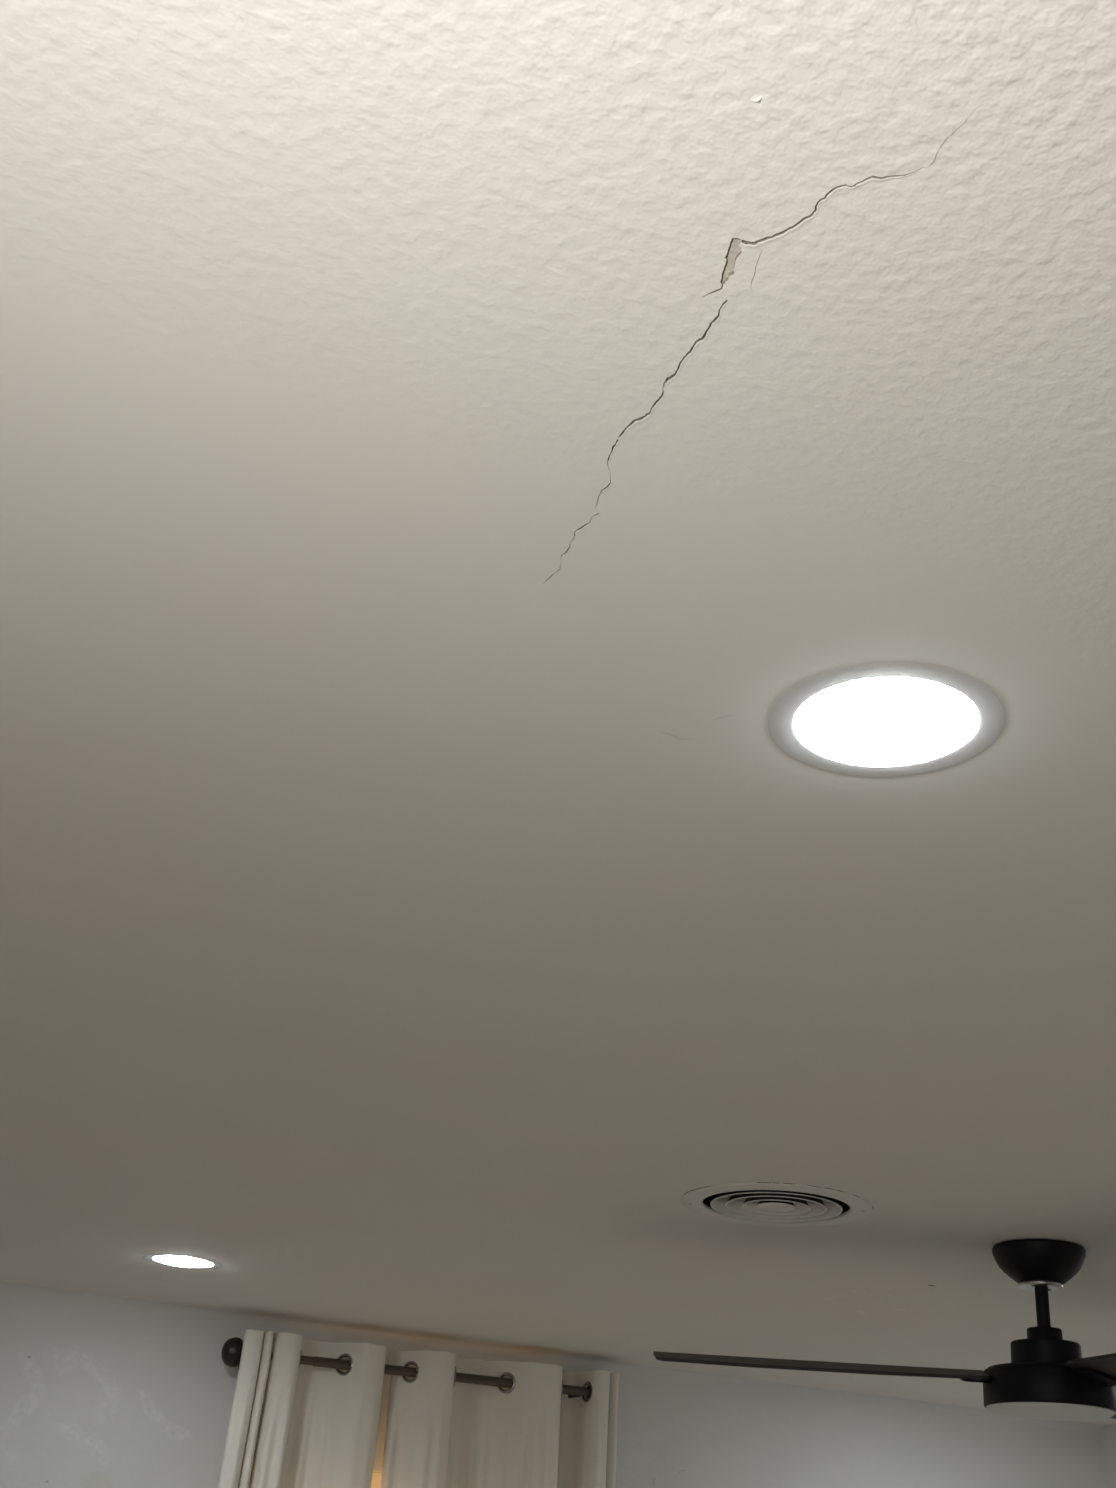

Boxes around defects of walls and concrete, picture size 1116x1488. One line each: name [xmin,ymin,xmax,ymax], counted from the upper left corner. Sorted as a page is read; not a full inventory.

crack [543,97,989,586]